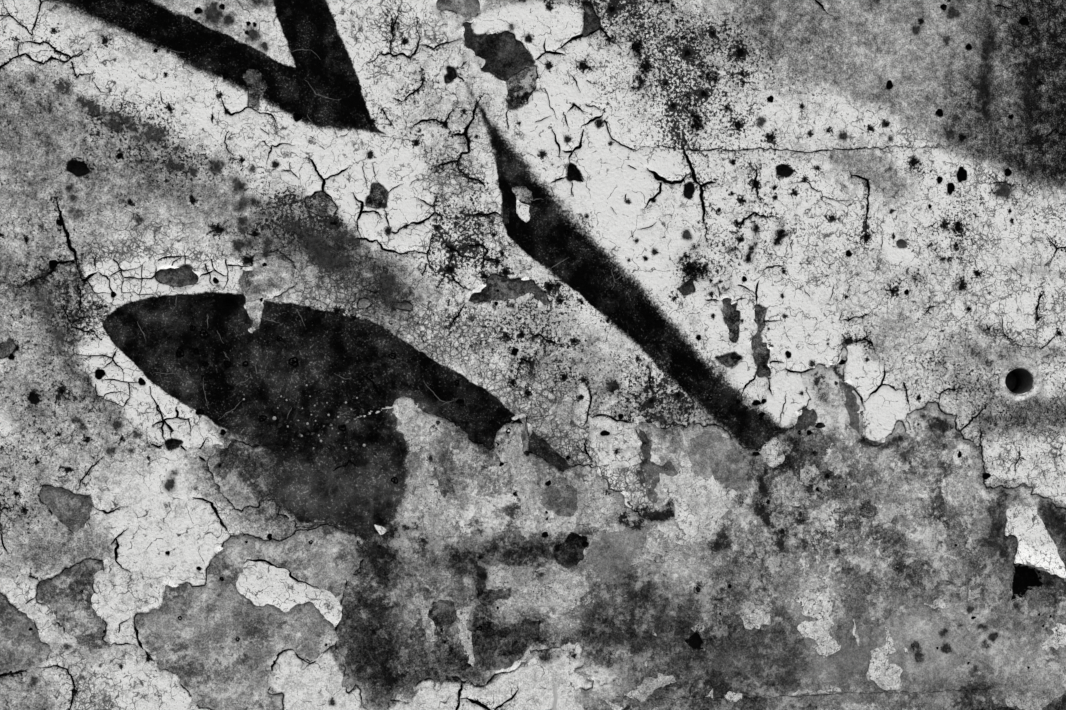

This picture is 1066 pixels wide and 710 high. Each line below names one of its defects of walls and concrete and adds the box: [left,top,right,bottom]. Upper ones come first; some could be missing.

crack [0,0,105,93]
crack [366,11,485,186]
peeling [431,0,553,109]
crack [211,79,495,324]
crack [469,211,504,224]
crack [532,27,951,322]
peeling [36,486,93,538]
peeling [135,337,1066,710]
peeling [0,559,109,674]
crack [455,684,519,710]